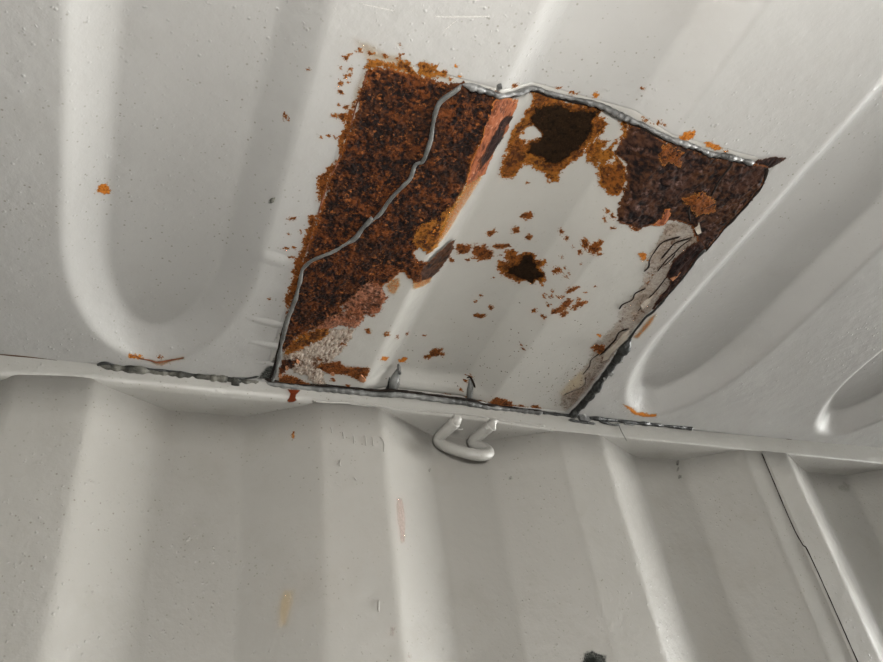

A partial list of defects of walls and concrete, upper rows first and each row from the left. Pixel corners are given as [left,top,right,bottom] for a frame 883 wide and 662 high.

corrosion [97,182,111,195]
corrosion [280,44,786,352]
peeling [559,222,705,412]
corrosion [129,353,184,365]
peeling [278,328,371,387]
corrosion [423,347,445,360]
corrosion [445,346,542,409]
corrosion [623,404,657,418]